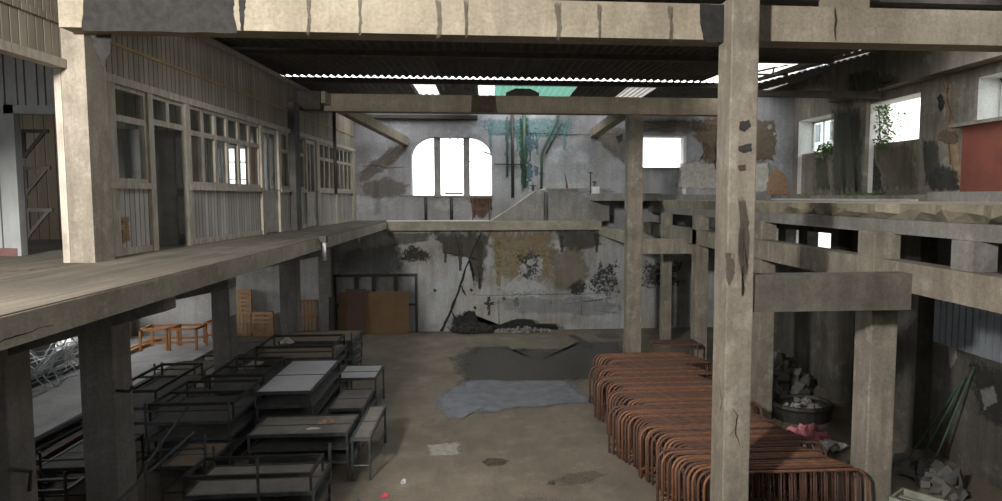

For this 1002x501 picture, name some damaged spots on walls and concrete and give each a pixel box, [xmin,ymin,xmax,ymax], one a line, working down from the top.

spalling [738,120,789,194]
water stain [388,230,622,323]
crack [0,325,52,343]
peeling [981,386,997,410]